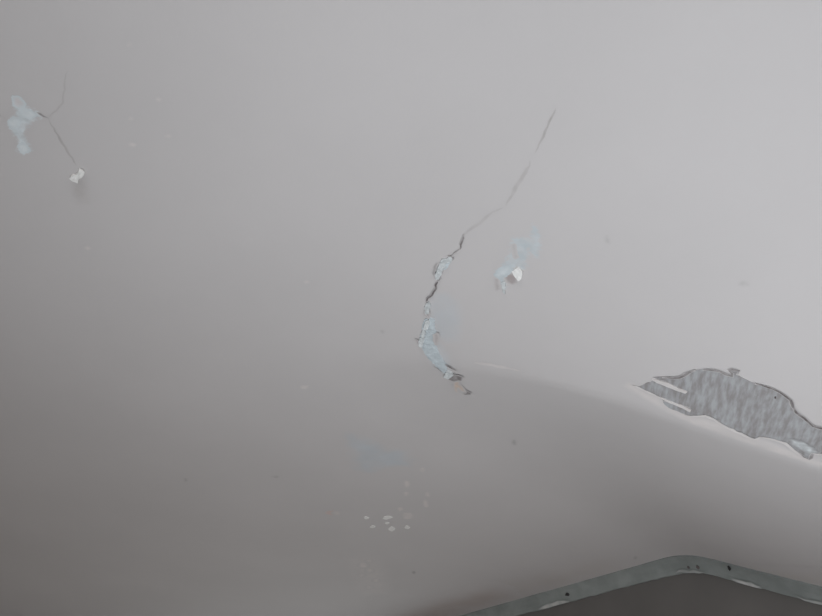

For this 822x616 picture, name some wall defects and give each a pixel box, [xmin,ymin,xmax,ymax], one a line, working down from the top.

peeling [1,70,77,166]
crack [415,108,556,395]
peeling [494,265,523,294]
peeling [620,369,822,470]